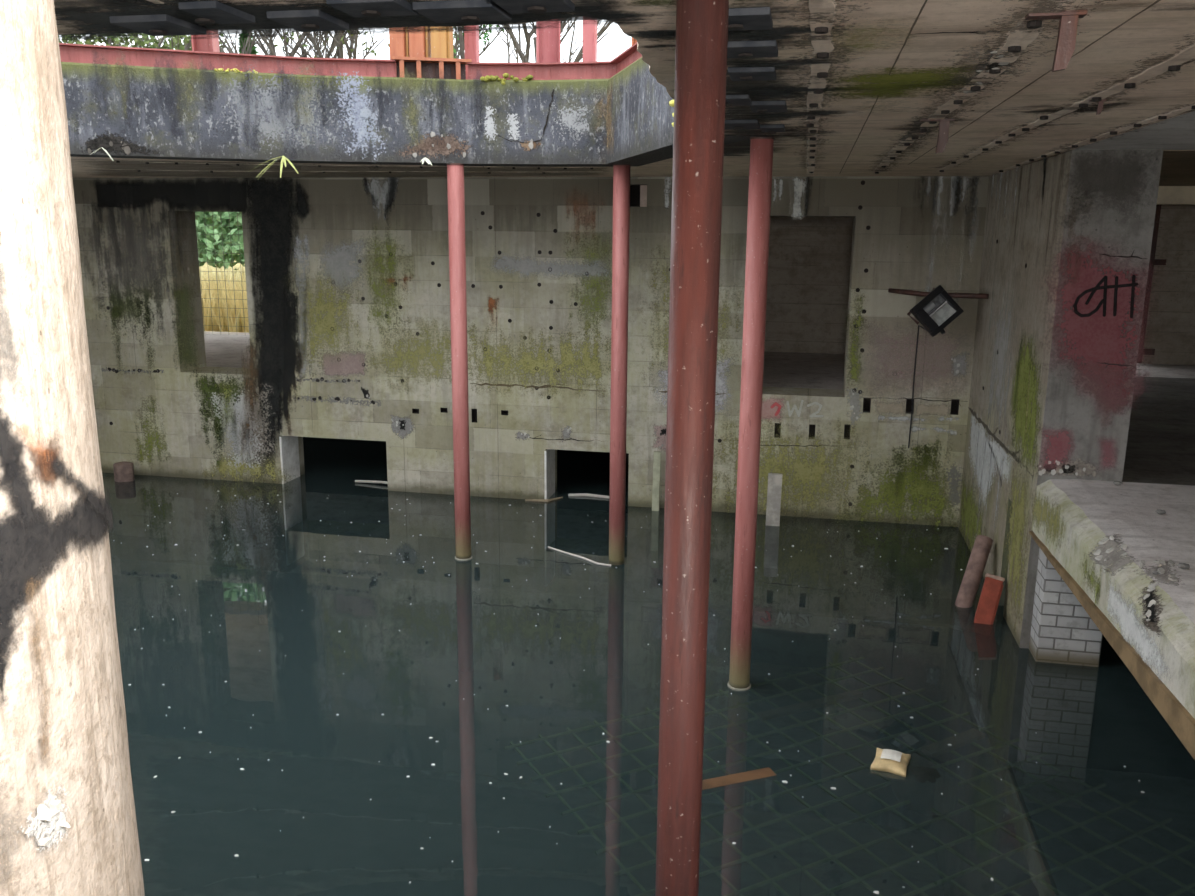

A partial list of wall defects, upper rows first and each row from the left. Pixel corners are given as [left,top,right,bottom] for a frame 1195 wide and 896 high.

damp [157,63,216,132]
damp [724,4,855,156]
damp [464,166,597,176]
damp [0,263,17,381]
damp [79,126,447,478]
spalling [1088,534,1182,637]